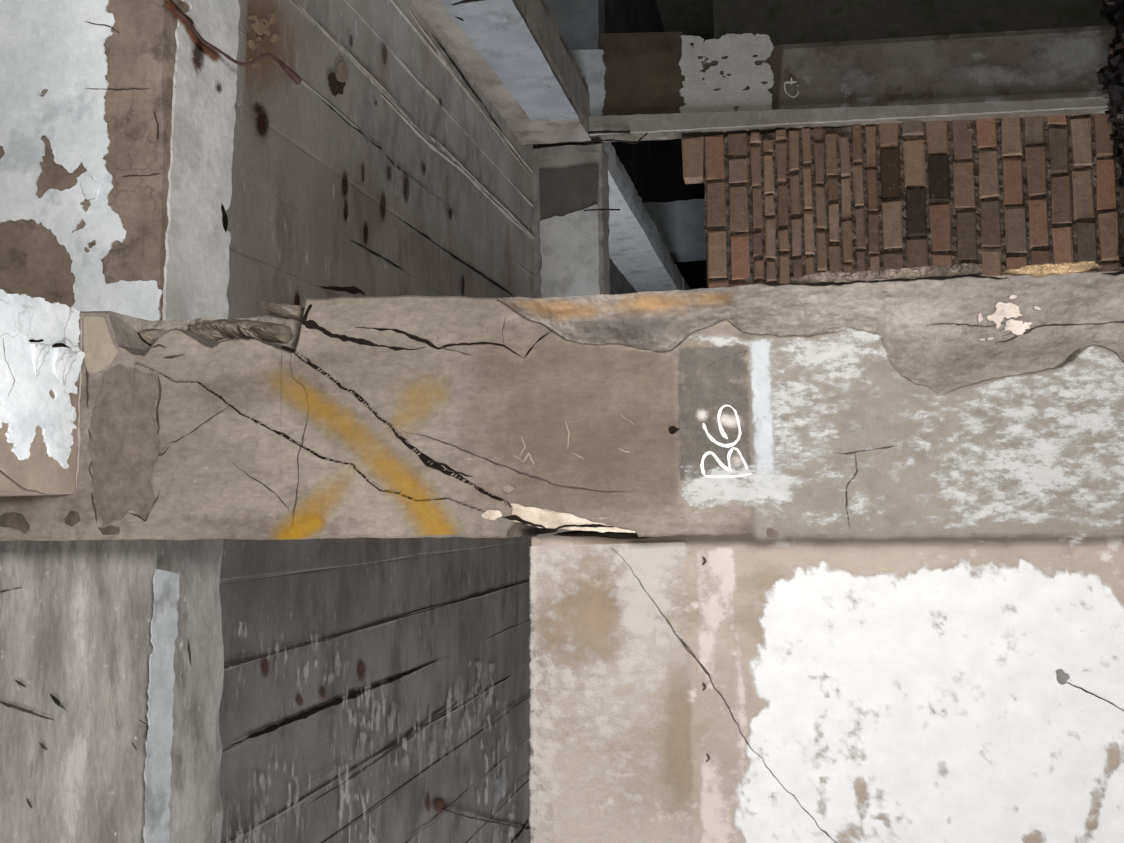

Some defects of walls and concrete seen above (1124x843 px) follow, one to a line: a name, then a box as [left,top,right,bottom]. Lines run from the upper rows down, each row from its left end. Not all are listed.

peeling [0,0,308,469]
rust [253,105,268,136]
crack [136,214,636,525]
peeling [679,33,774,113]
peeling [497,204,1124,543]
peeling [0,512,30,534]
crack [234,635,341,664]
crack [230,655,451,746]
crack [283,698,463,804]
peeling [482,484,688,843]
crack [612,548,837,843]
peeling [734,559,1124,843]